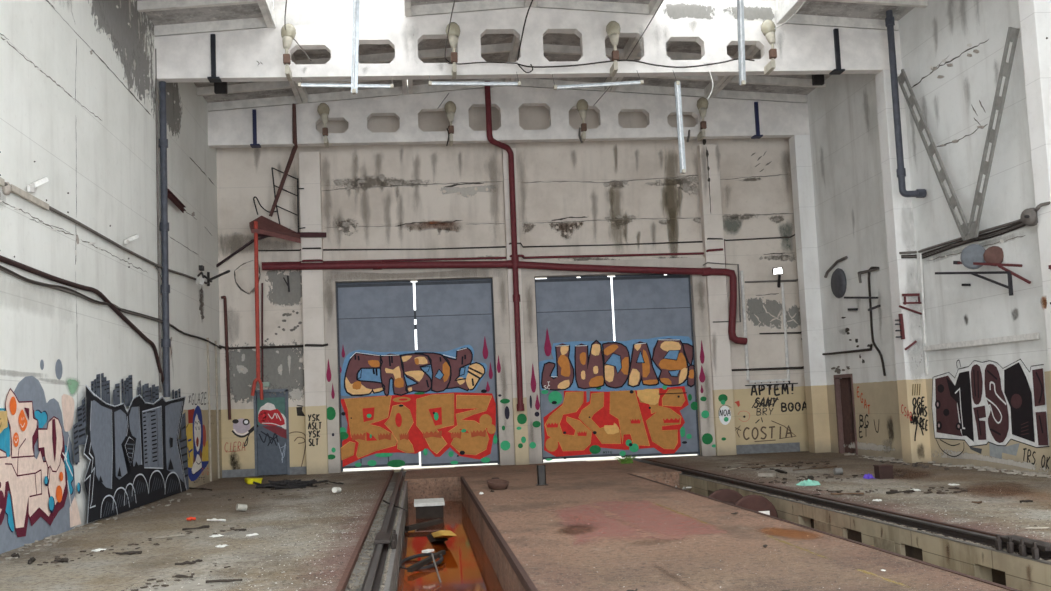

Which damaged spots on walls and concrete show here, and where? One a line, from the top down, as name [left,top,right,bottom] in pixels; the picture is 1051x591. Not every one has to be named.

crack [0,33,102,121]
crack [46,0,150,114]
peeling [88,0,182,137]
crack [0,155,147,272]
peeling [746,293,801,329]